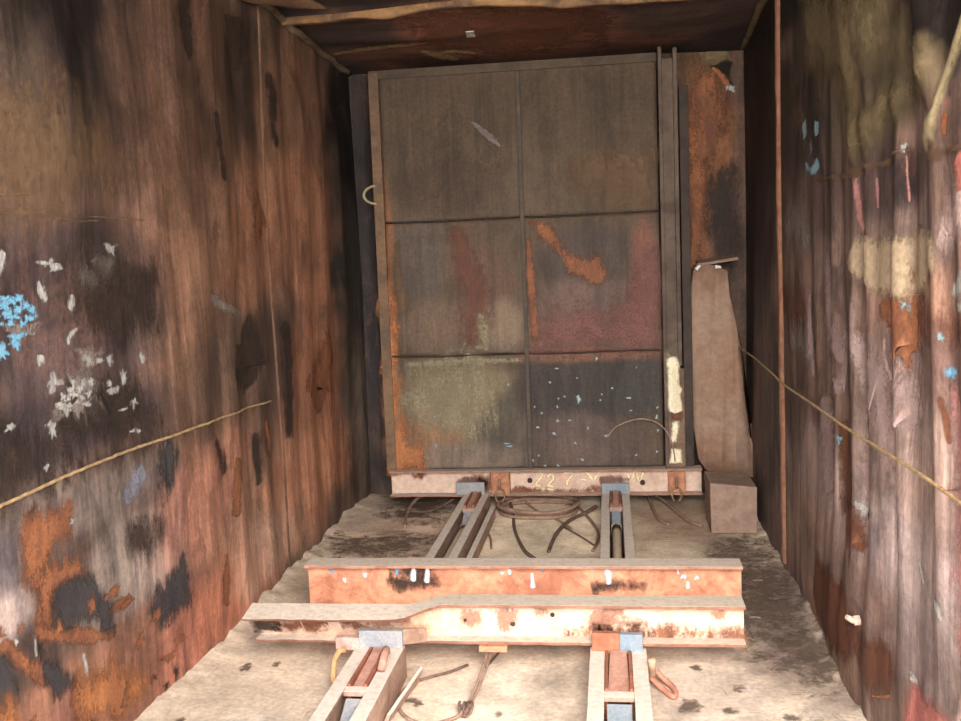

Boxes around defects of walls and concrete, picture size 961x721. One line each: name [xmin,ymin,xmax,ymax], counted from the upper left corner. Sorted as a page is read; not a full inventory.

rust [680,51,728,272]
rust [529,220,606,285]
rust [376,281,426,479]
rust [0,500,134,688]
peeling [52,572,116,635]
peeling [150,553,192,629]
peeling [0,652,20,713]
rust [0,694,36,721]
peeling [43,659,78,703]
rust [71,653,147,721]